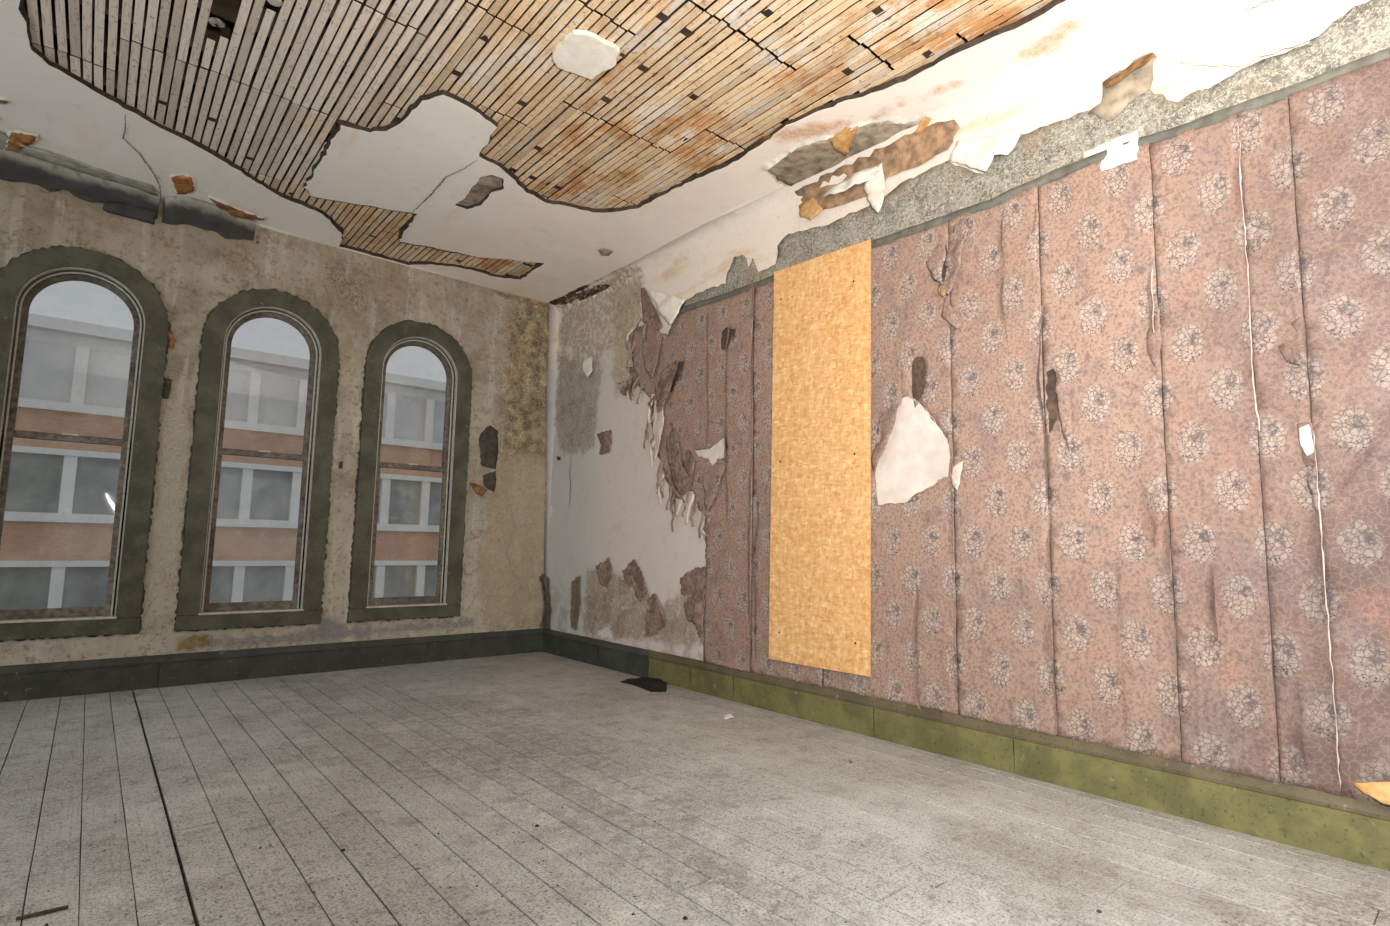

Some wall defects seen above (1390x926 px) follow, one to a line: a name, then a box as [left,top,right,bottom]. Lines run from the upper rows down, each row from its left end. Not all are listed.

flaking render [18,0,1066,280]
flaking render [1088,52,1157,121]
flaking render [1236,19,1332,67]
peeling [549,267,686,460]